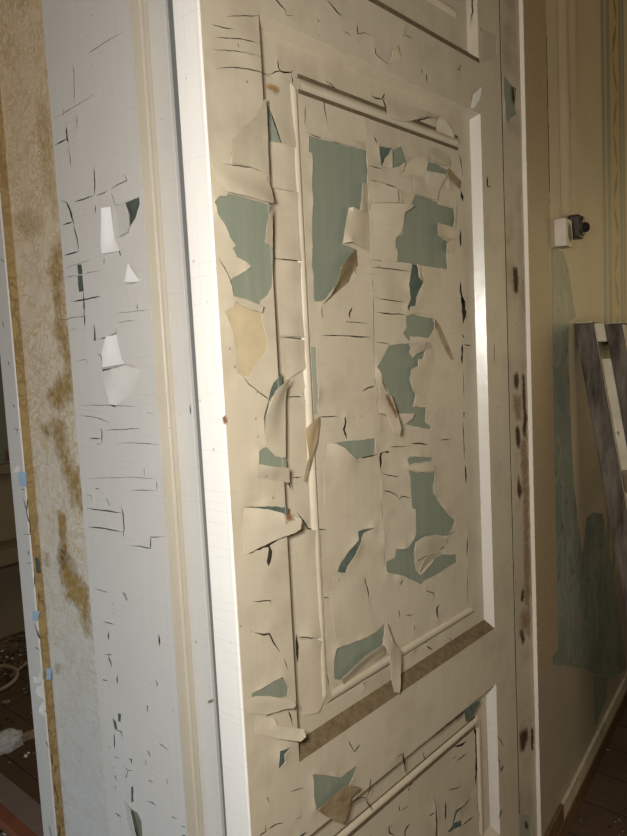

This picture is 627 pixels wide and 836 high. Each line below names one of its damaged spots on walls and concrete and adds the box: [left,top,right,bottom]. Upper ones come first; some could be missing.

crack [212,15,293,82]
leakage [49,253,71,407]
crack [63,171,127,330]
peeling [101,202,129,254]
peeling [211,71,461,483]
leakage [42,421,82,504]
leakage [57,513,89,632]
crack [82,405,157,445]
crack [87,478,166,549]
peeling [242,508,402,742]
peeling [386,457,456,584]
peeling [313,764,361,823]